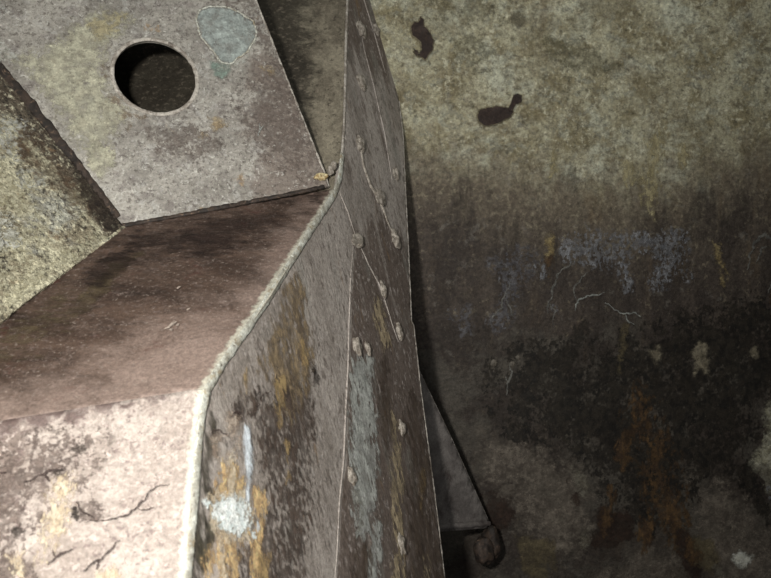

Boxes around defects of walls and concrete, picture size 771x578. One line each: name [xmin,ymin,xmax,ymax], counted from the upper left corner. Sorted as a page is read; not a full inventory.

damp [560,229,687,292]
crack [547,261,641,325]
corrosion [257,272,316,428]
damp [226,385,263,501]
damp [350,297,406,578]
crack [76,485,167,523]
crack [47,549,72,565]
crack [83,540,120,571]